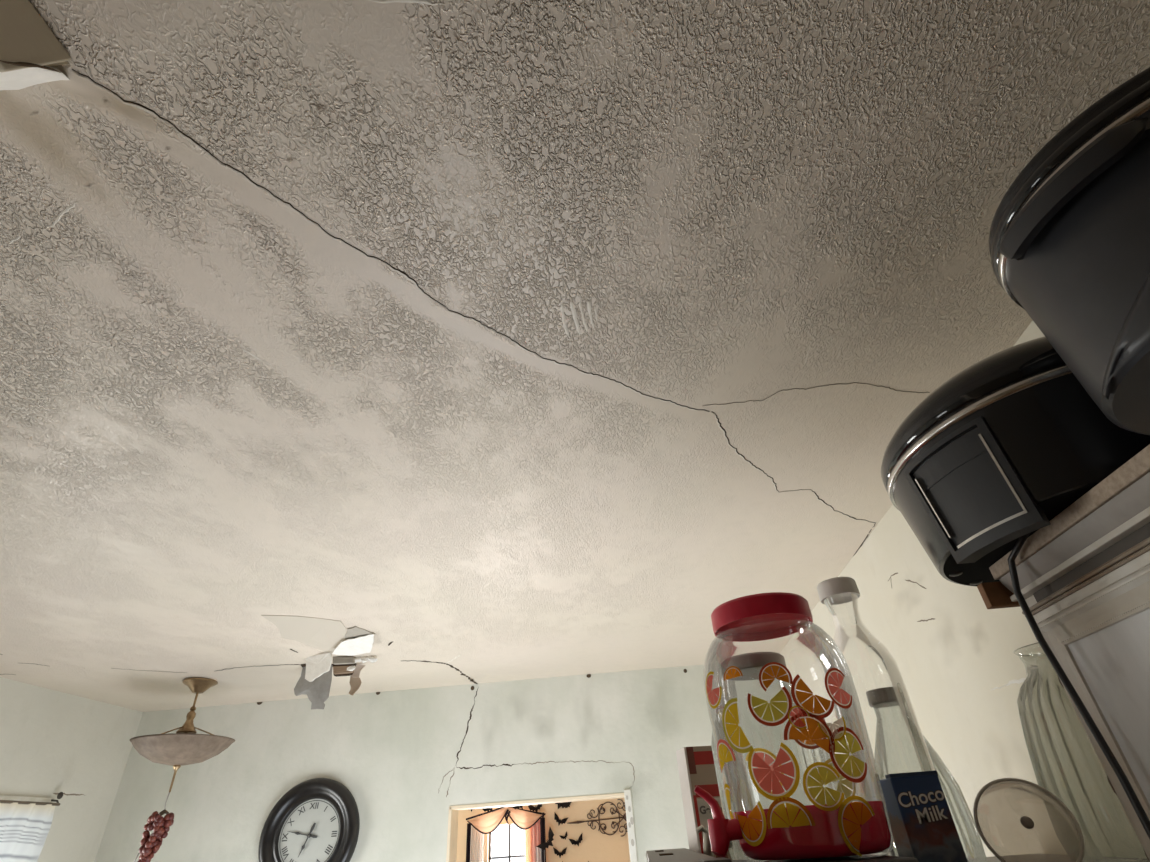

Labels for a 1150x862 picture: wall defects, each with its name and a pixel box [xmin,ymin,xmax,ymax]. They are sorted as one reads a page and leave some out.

crack [0,60,930,556]
peeling [261,615,378,710]
crack [388,642,635,797]